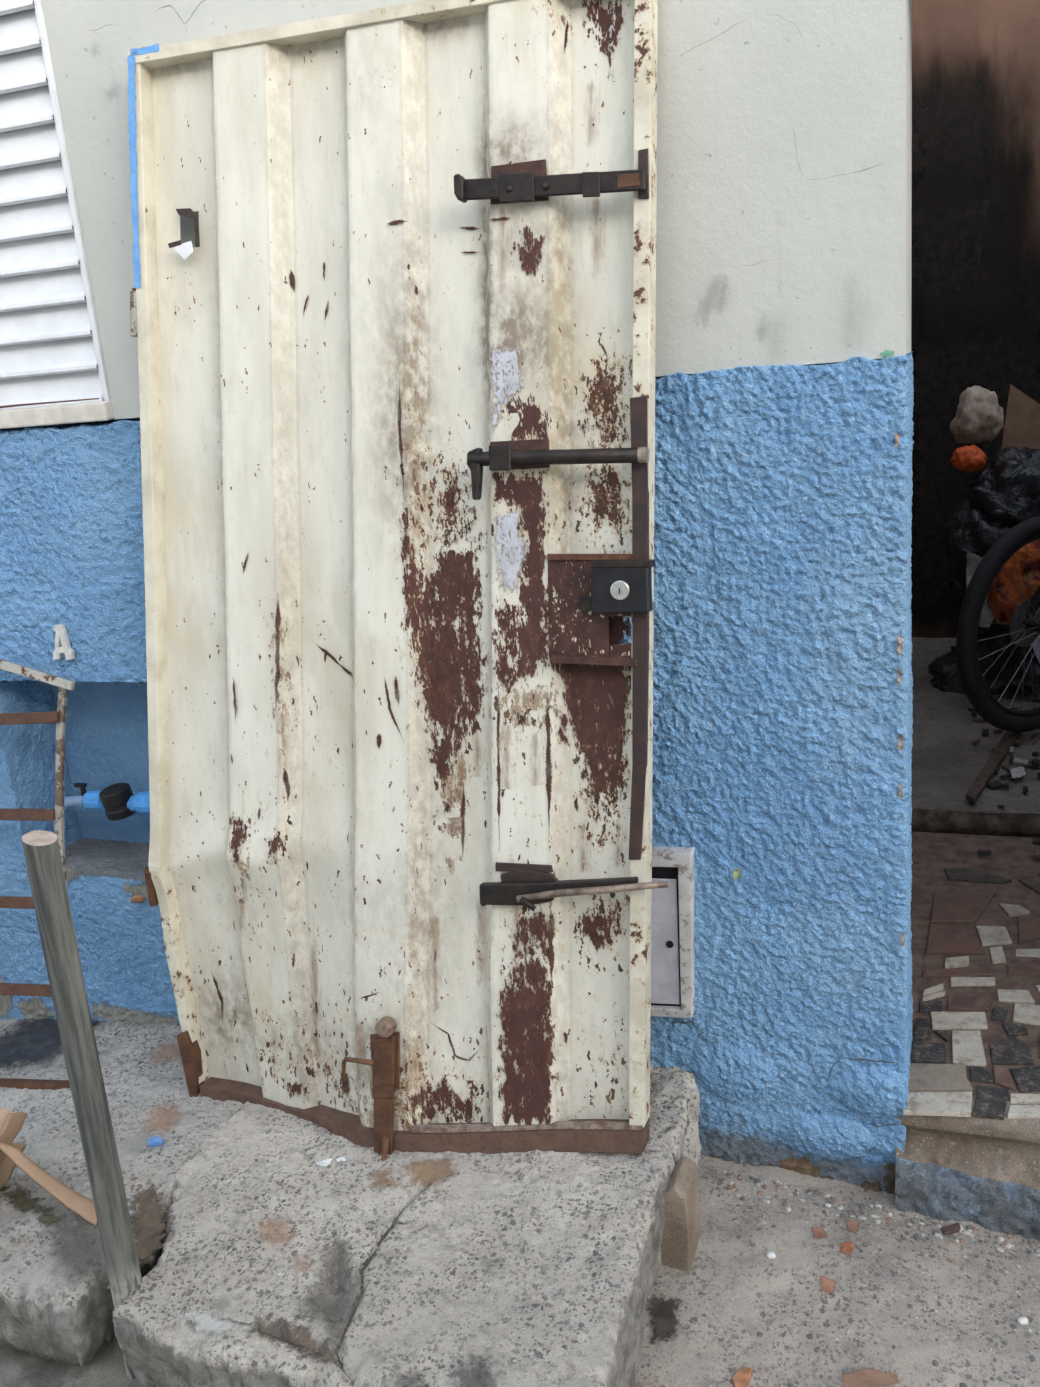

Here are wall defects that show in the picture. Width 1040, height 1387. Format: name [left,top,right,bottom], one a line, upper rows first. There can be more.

crack [192,1309,300,1346]
crack [336,1187,428,1376]